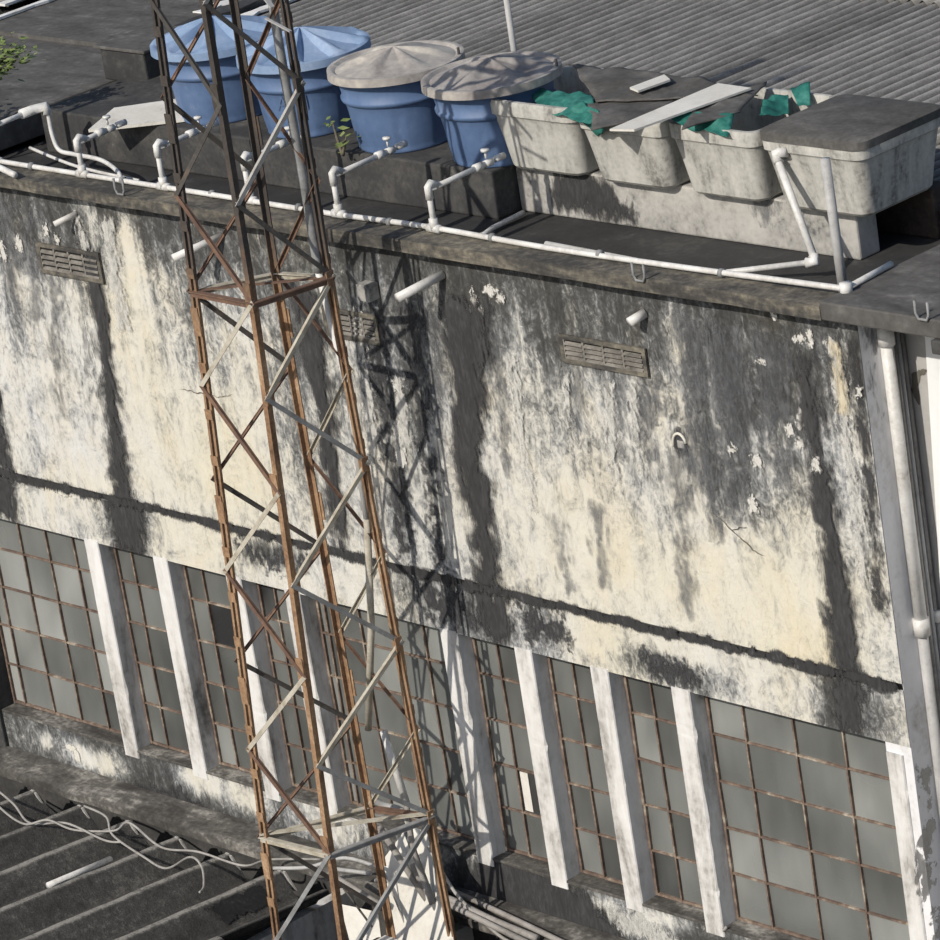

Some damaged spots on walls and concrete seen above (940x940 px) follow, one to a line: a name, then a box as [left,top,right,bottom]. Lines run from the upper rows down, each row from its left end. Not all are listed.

leakage [550,173,637,225]
leakage [755,200,779,221]
leakage [0,195,313,578]
leakage [287,282,899,736]
leakage [134,779,204,807]